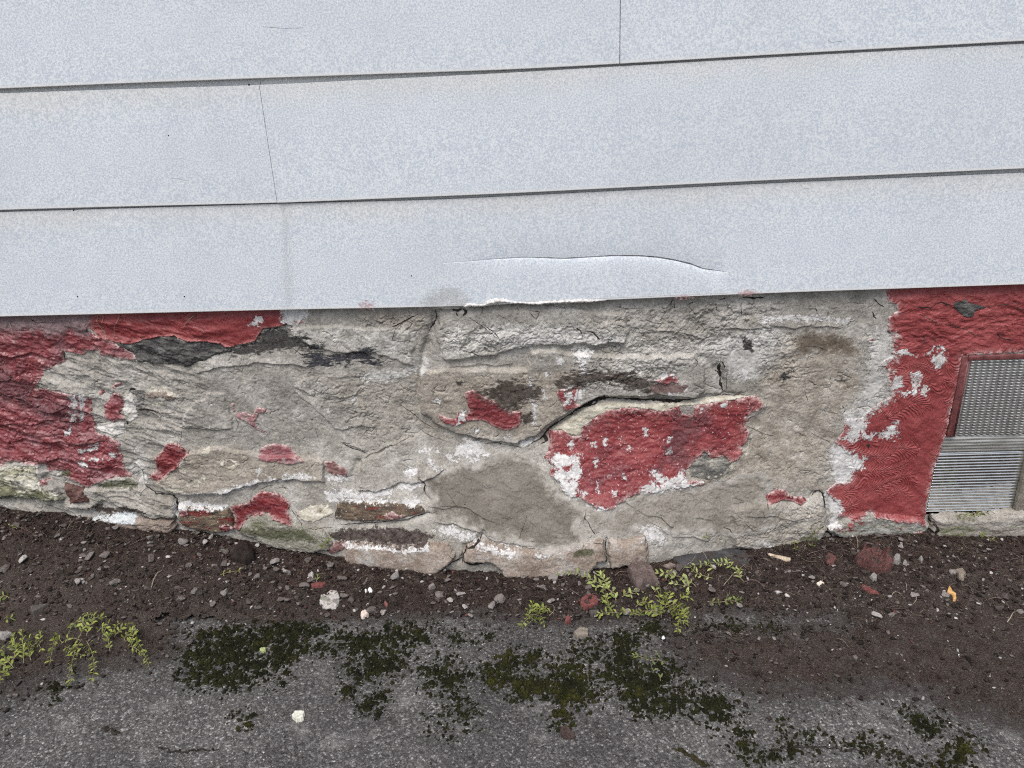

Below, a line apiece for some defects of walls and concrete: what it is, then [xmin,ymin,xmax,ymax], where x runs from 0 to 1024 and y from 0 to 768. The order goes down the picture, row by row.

damp [231,309,431,385]
crack [576,297,764,340]
peeling [0,310,304,501]
peeling [439,390,522,430]
crack [487,359,751,448]
peeling [544,386,763,510]
crack [804,345,845,442]
peeling [826,284,1024,534]
peeling [219,491,334,532]